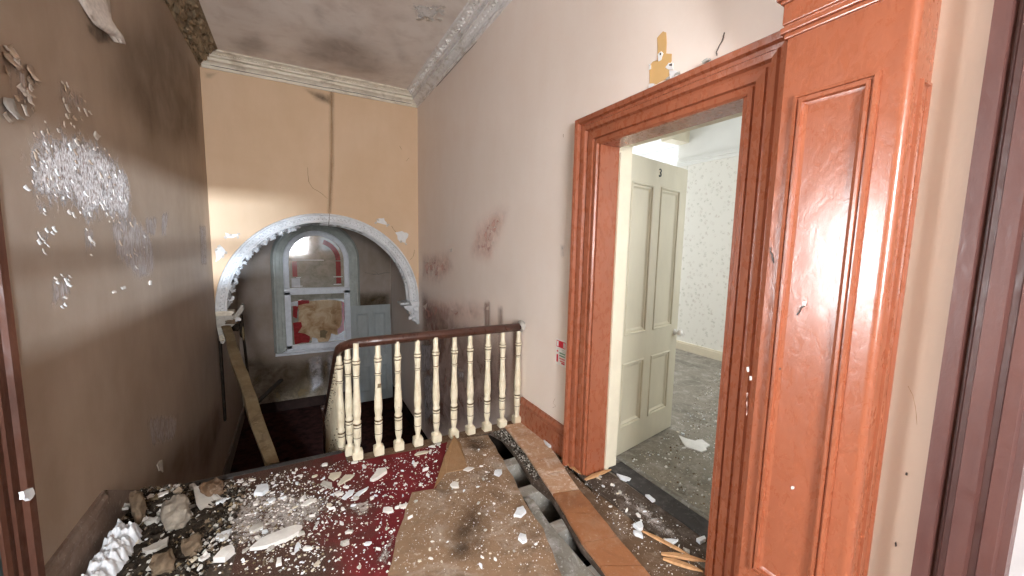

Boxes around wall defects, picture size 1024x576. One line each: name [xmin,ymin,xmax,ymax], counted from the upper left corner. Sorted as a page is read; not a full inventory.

peeling [79,0,126,44]
peeling [3,44,153,285]
crack [211,65,410,225]
peeling [374,218,408,245]
peeling [53,274,73,309]